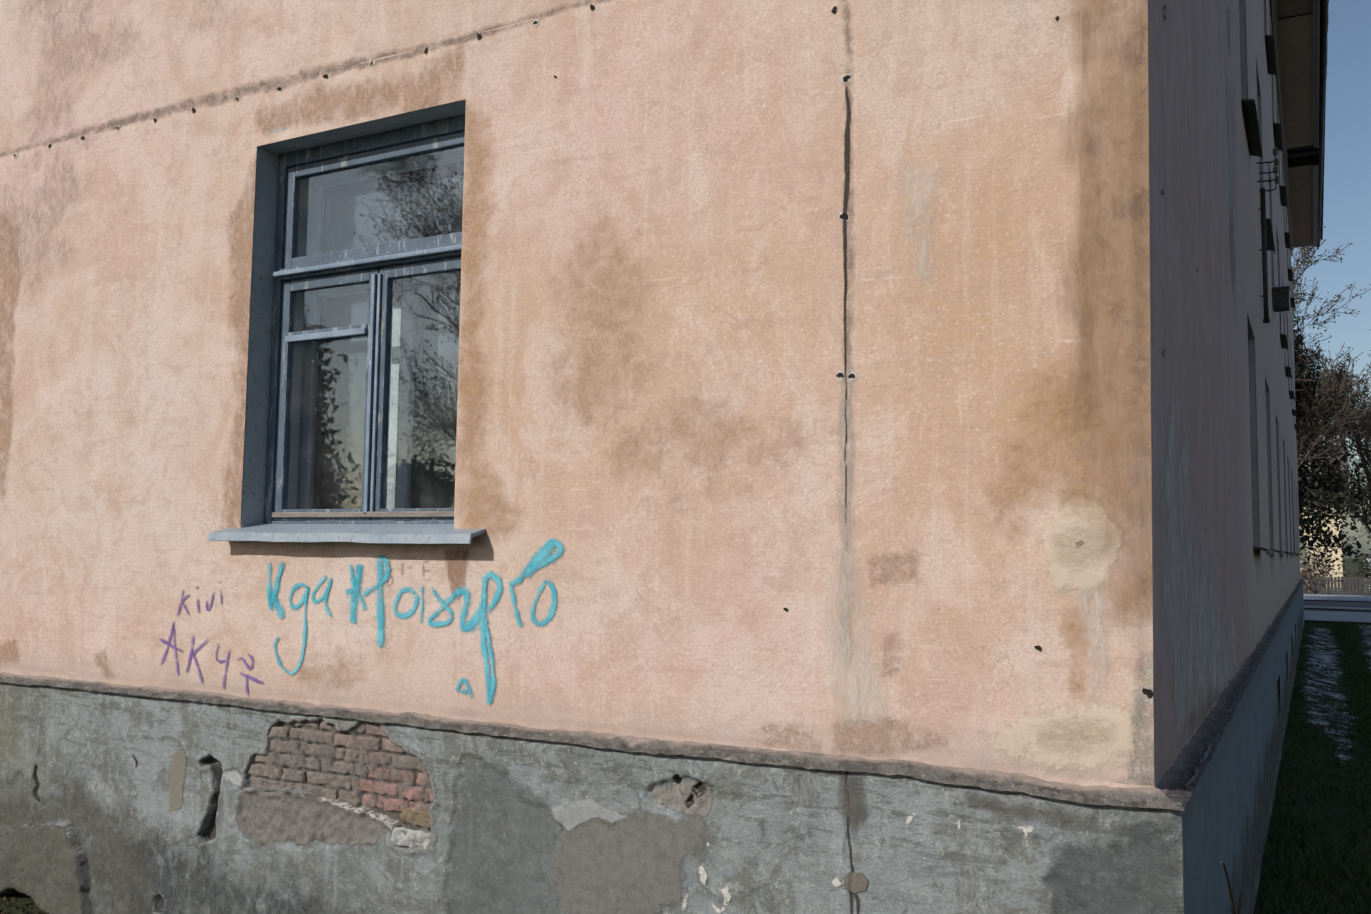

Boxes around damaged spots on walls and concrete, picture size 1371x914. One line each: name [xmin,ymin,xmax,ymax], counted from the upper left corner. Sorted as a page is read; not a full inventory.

damp [1007,0,1152,611]
flaking render [200,715,437,854]
flaking render [652,774,712,817]
peeling [712,887,731,913]
crack [842,772,865,914]